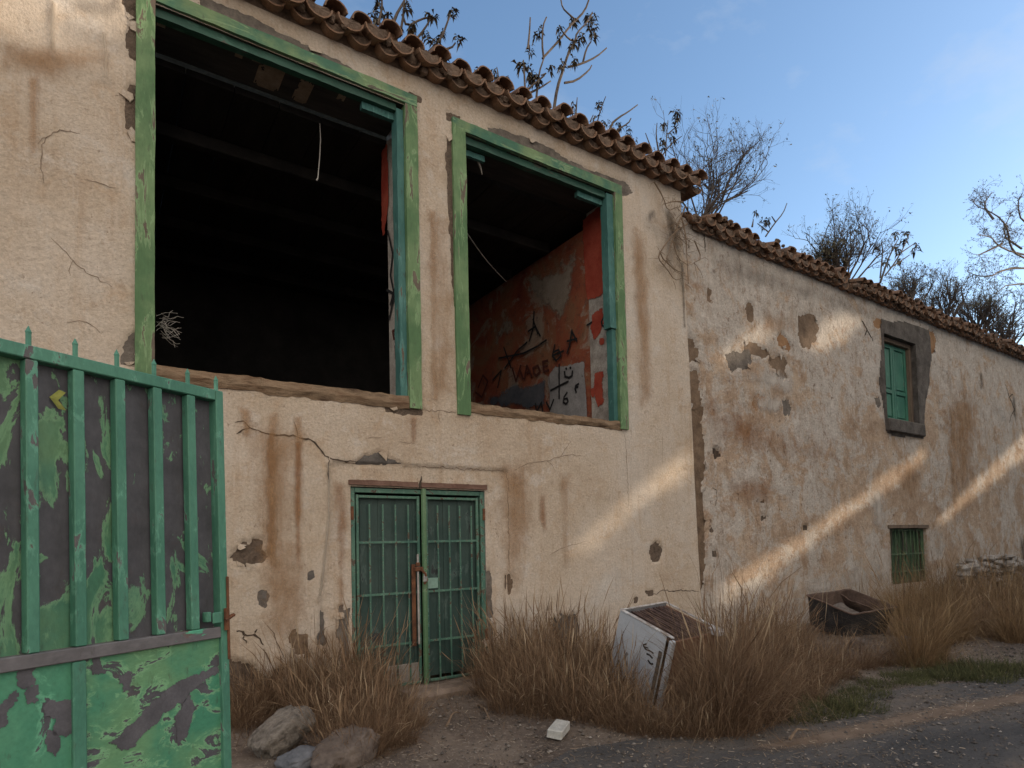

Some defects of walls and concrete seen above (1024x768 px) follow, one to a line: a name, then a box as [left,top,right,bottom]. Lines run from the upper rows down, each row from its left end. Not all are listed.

spalling [122,0,136,61]
spalling [119,85,136,143]
crack [39,129,80,182]
crack [51,238,112,287]
spalling [745,302,754,323]
spalling [725,314,819,380]
crack [237,421,356,480]
spalling [356,451,401,465]
spalling [688,338,721,588]
spalling [230,539,268,571]
spalling [649,542,662,562]
crack [237,629,264,645]